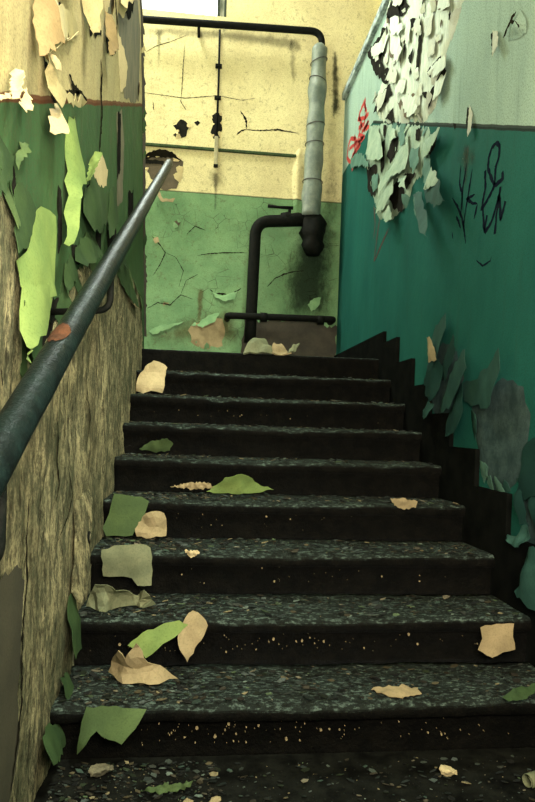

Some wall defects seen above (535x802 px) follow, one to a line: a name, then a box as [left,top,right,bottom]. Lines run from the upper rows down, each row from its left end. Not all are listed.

spalling [173,119,200,139]
spalling [210,113,222,139]
crack [148,36,295,135]
peeling [350,0,464,238]
peeling [0,0,184,411]
crack [148,236,244,308]
corrosion [47,323,71,342]
peeling [0,220,535,802]